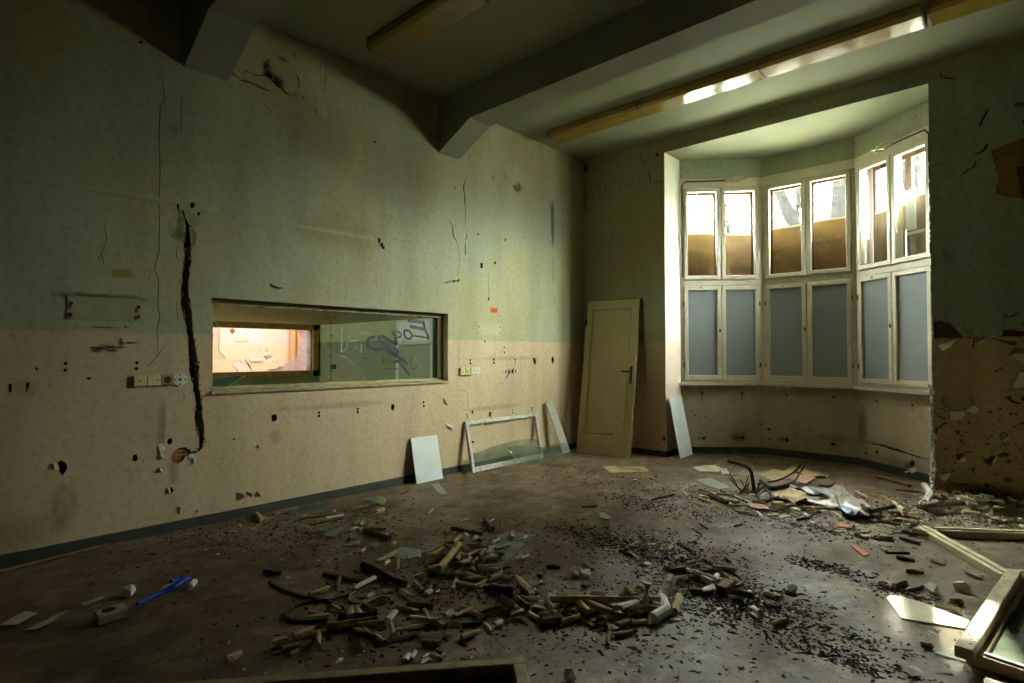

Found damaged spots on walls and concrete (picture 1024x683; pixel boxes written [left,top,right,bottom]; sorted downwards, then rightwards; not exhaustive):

peeling [992,138,1024,200]
crack [148,75,206,454]
spalling [931,317,985,351]
peeling [905,323,1024,497]
spalling [157,438,197,472]
crack [867,442,927,459]